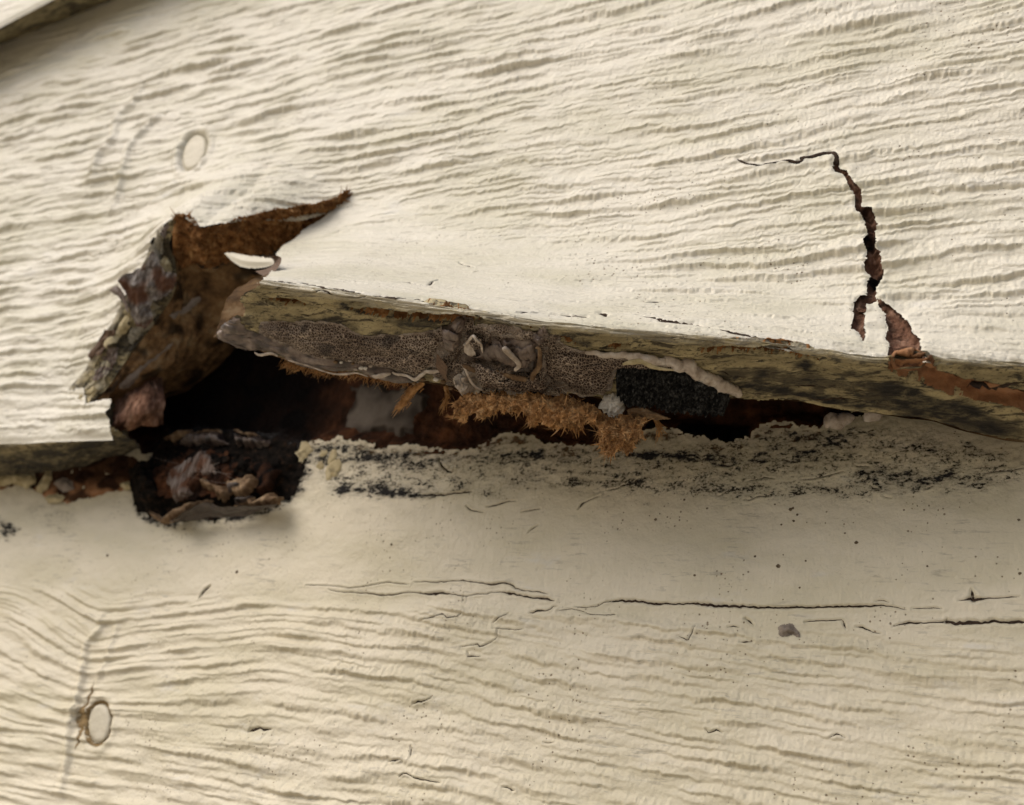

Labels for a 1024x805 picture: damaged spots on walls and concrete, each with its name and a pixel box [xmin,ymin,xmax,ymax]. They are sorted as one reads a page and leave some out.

crack [738,151,888,341]
peeling [77,225,177,403]
spalling [865,298,1024,412]
peeling [345,382,430,437]
peeling [295,441,342,480]
damp [198,427,1019,524]
crack [313,580,1024,657]